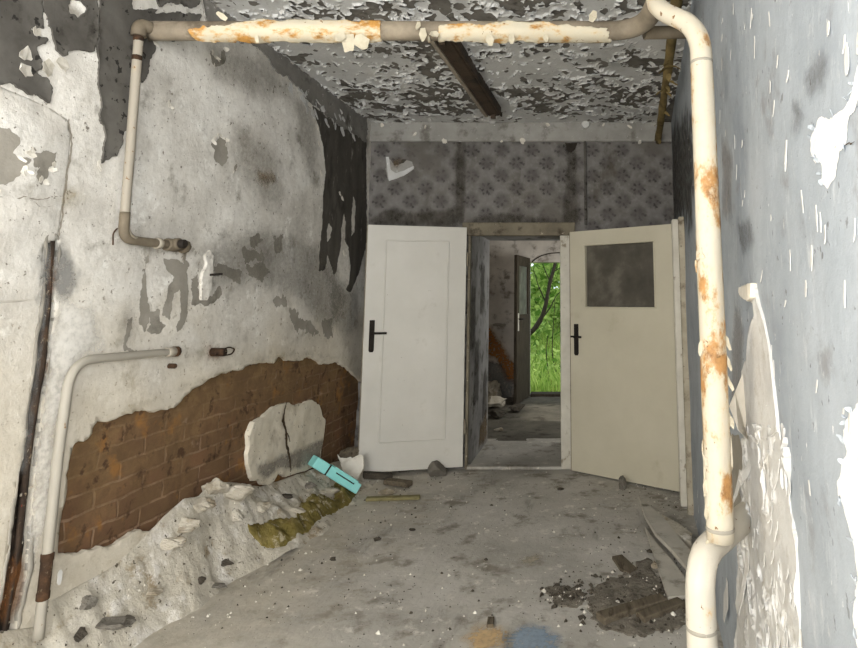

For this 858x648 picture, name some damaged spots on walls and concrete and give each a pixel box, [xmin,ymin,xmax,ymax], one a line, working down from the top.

peeling [19,46,69,77]
peeling [188,0,685,141]
flaking render [807,32,858,189]
flaking render [123,233,283,352]
flaking render [273,295,333,339]
flaking render [58,357,358,553]
crack [282,402,291,472]
peeling [723,270,803,648]